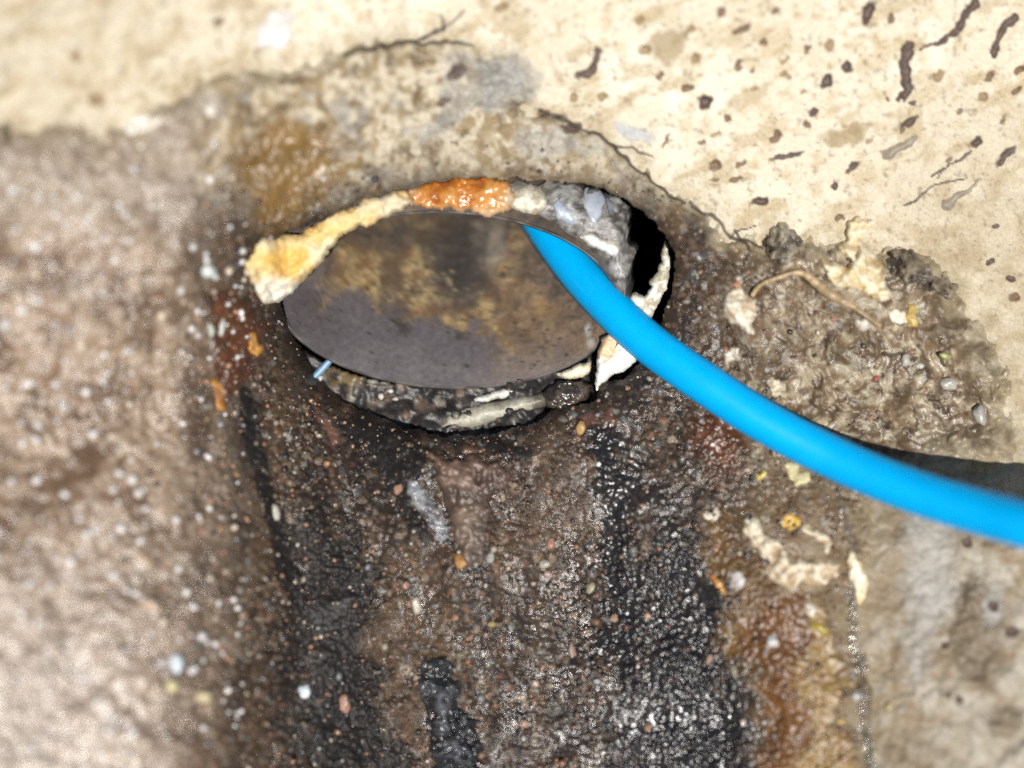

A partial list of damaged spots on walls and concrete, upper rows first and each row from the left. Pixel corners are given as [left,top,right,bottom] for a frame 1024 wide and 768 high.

crack [344,9,474,57]
corrosion [408,176,516,218]
peeling [553,187,615,225]
crack [538,109,769,289]
damp [336,419,431,545]
damp [481,437,532,462]
damp [239,388,414,768]
damp [584,426,749,768]